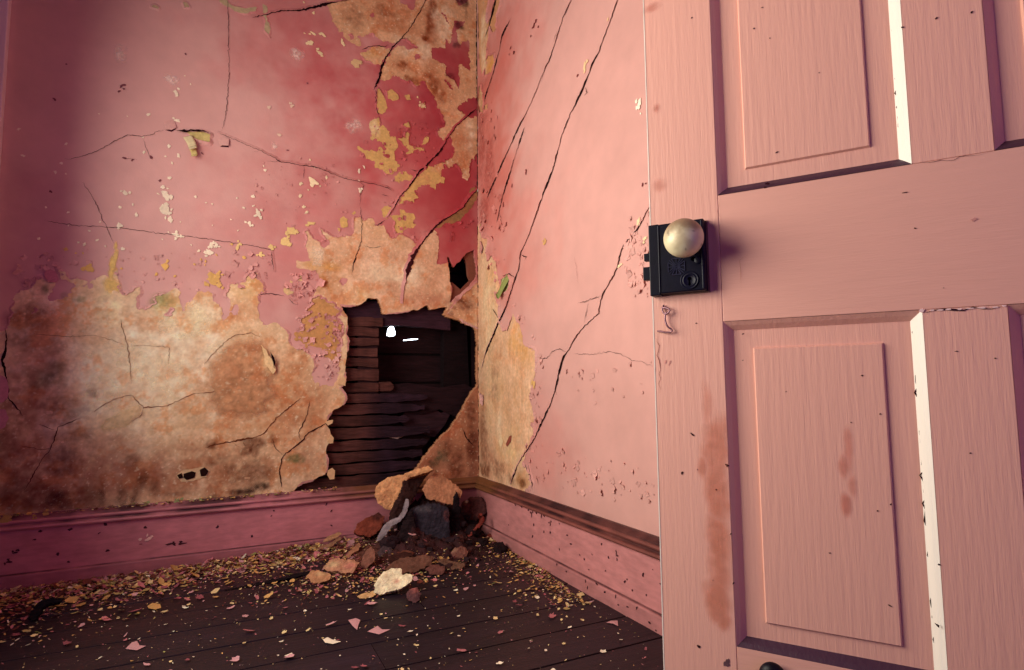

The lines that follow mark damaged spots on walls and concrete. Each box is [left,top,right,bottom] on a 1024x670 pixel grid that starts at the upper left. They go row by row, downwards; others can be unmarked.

crack [1,330,21,413]
crack [22,323,215,490]
crack [205,332,275,367]
crack [207,401,326,487]
crack [49,0,571,304]
flaking render [0,0,658,516]
crack [464,0,617,458]
crack [510,205,661,493]